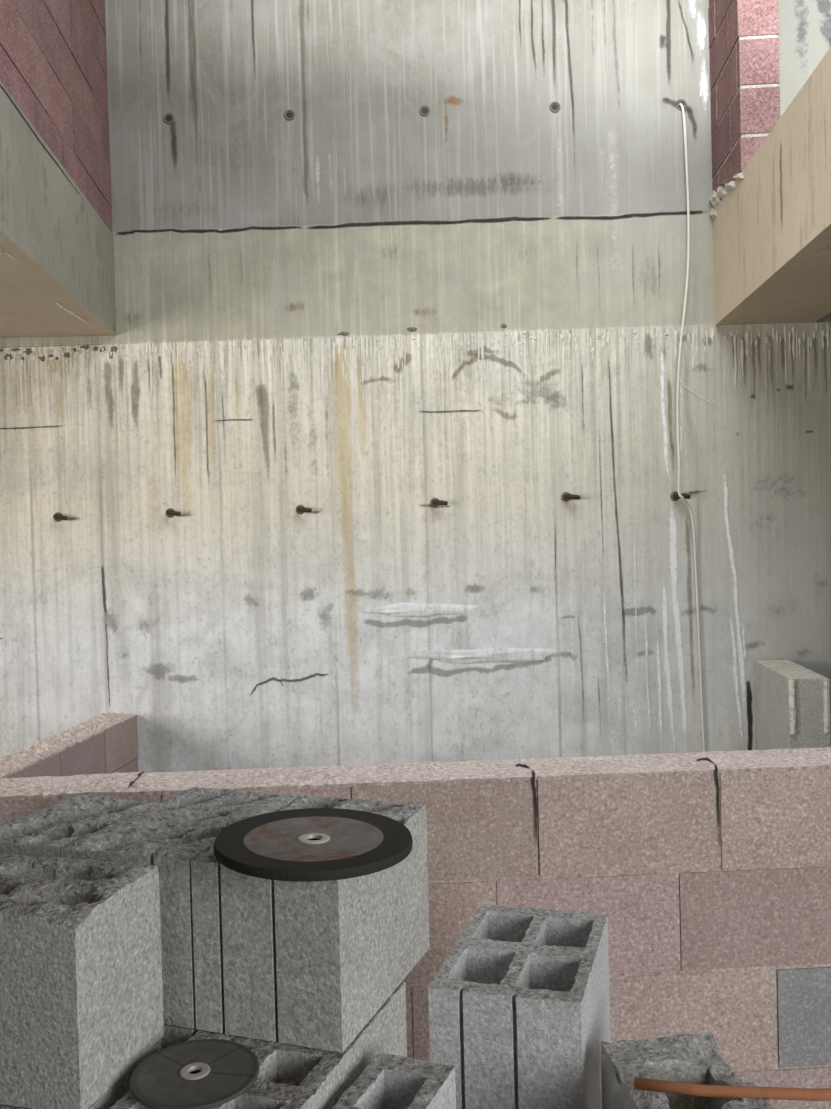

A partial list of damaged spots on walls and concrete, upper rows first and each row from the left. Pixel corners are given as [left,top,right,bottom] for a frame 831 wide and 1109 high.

crack [251,673,327,694]
water stain [3,323,831,745]